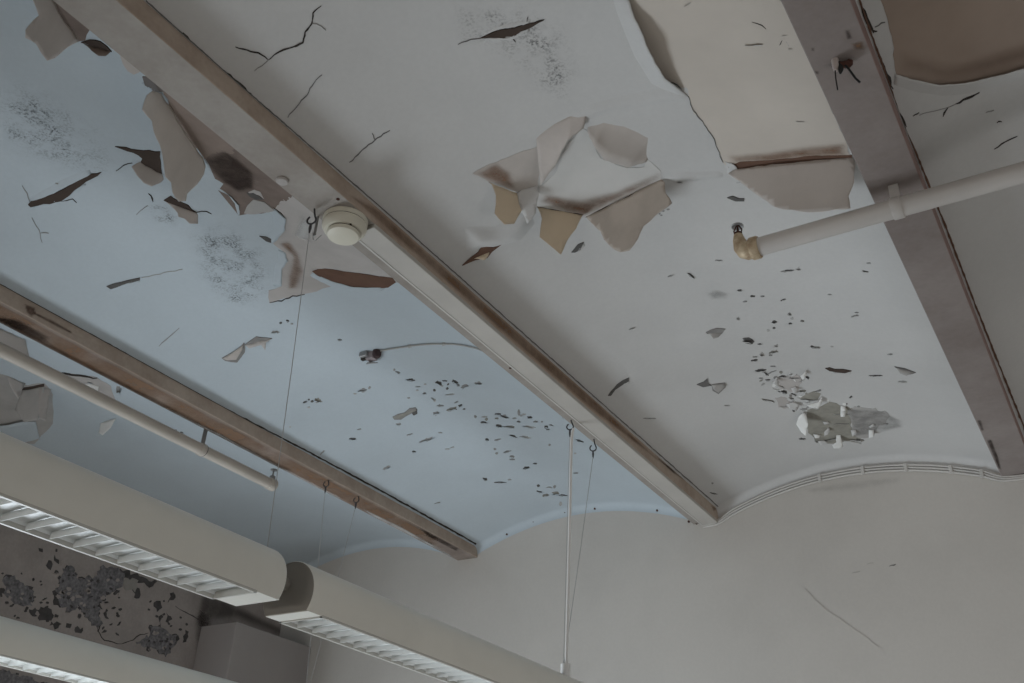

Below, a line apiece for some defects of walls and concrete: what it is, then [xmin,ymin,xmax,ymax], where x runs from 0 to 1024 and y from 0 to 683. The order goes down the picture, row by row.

peeling [25,0,112,61]
peeling [881,0,1024,96]
peeling [613,0,855,212]
peeling [142,76,398,303]
peeling [473,116,683,255]
crack [146,0,718,507]
peeling [0,374,54,444]
peeling [393,369,565,470]
spalling [743,337,890,449]
spalling [0,548,189,657]